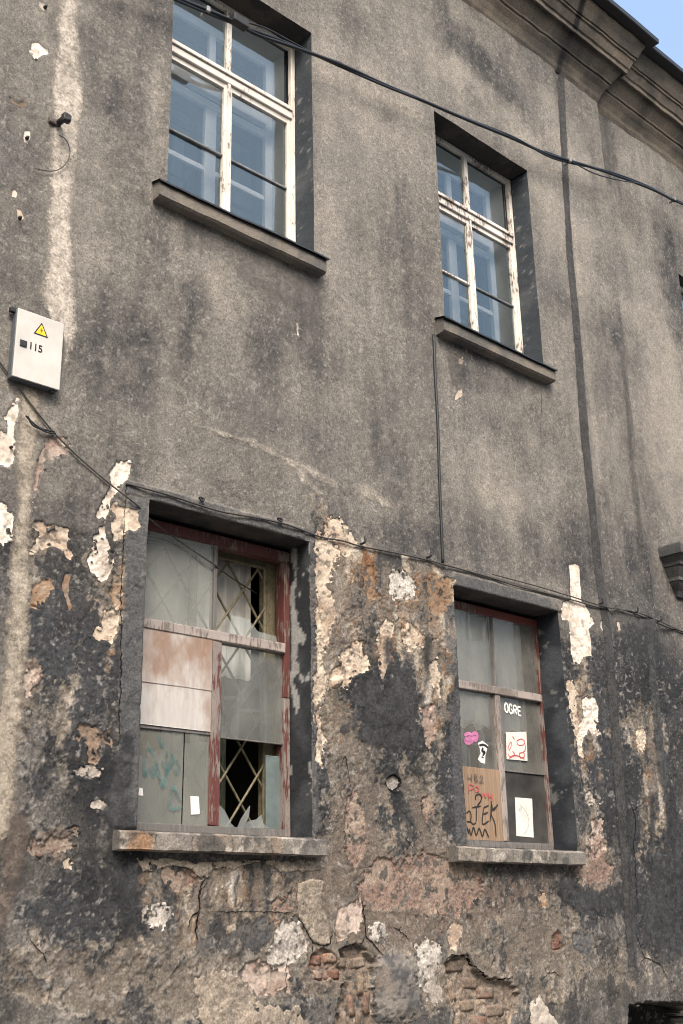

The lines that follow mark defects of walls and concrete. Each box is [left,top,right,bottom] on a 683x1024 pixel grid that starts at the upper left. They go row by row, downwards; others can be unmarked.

peeling [0,502,14,546]
peeling [87,457,141,644]
rust [360,548,381,600]
peeling [311,513,456,769]
leakage [384,637,392,674]
leakage [424,636,432,682]
peeling [561,564,603,664]
peeling [566,680,601,759]
leakage [646,624,675,867]
crack [173,859,409,985]
peeling [137,783,558,1024]
crack [447,949,513,981]